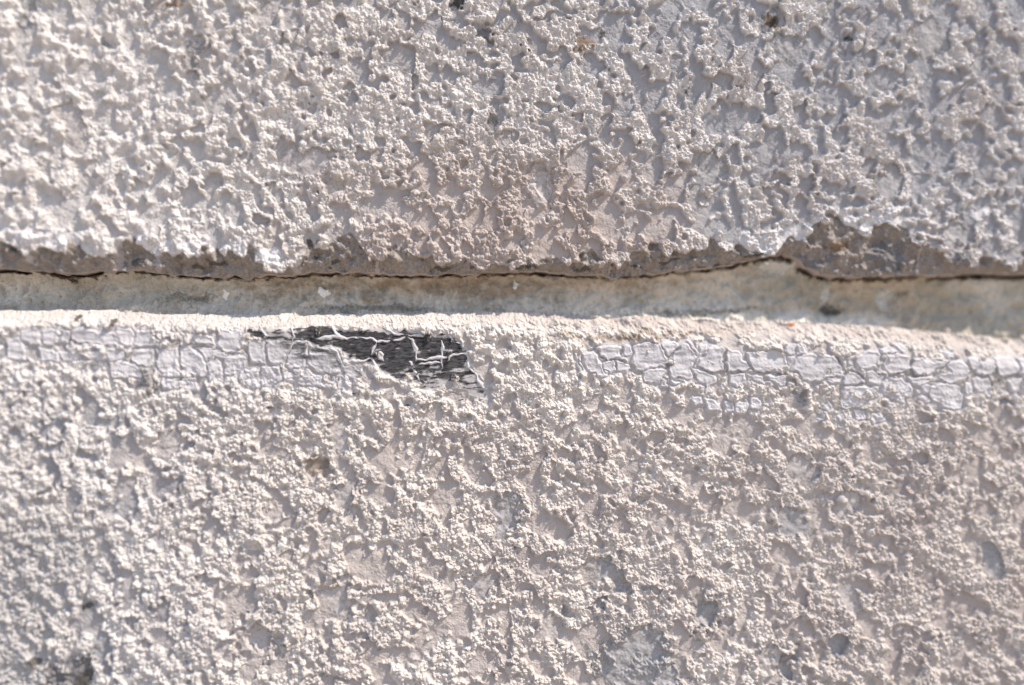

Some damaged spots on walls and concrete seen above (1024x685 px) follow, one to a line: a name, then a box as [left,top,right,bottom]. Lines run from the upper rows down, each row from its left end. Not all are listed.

spalling [0,163,1024,279]
crack [17,255,1003,283]
crack [37,321,294,379]
peeling [6,317,495,407]
crack [594,345,681,388]
crack [694,348,788,384]
crack [834,355,1021,410]